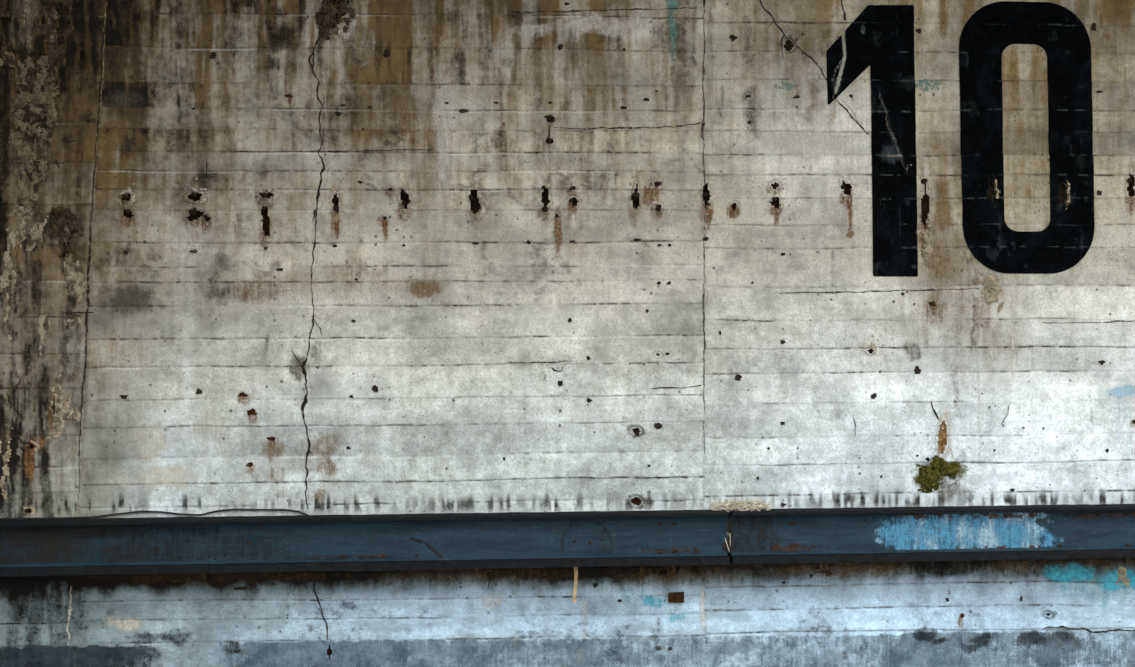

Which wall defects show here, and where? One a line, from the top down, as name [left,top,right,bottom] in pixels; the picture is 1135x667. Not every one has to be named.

water stain [265,8,294,71]
water stain [521,10,641,35]
crack [760,0,905,168]
flaking render [0,0,88,342]
flaking render [38,314,86,358]
water stain [105,286,151,313]
crack [236,0,432,508]
flaking render [0,373,81,500]